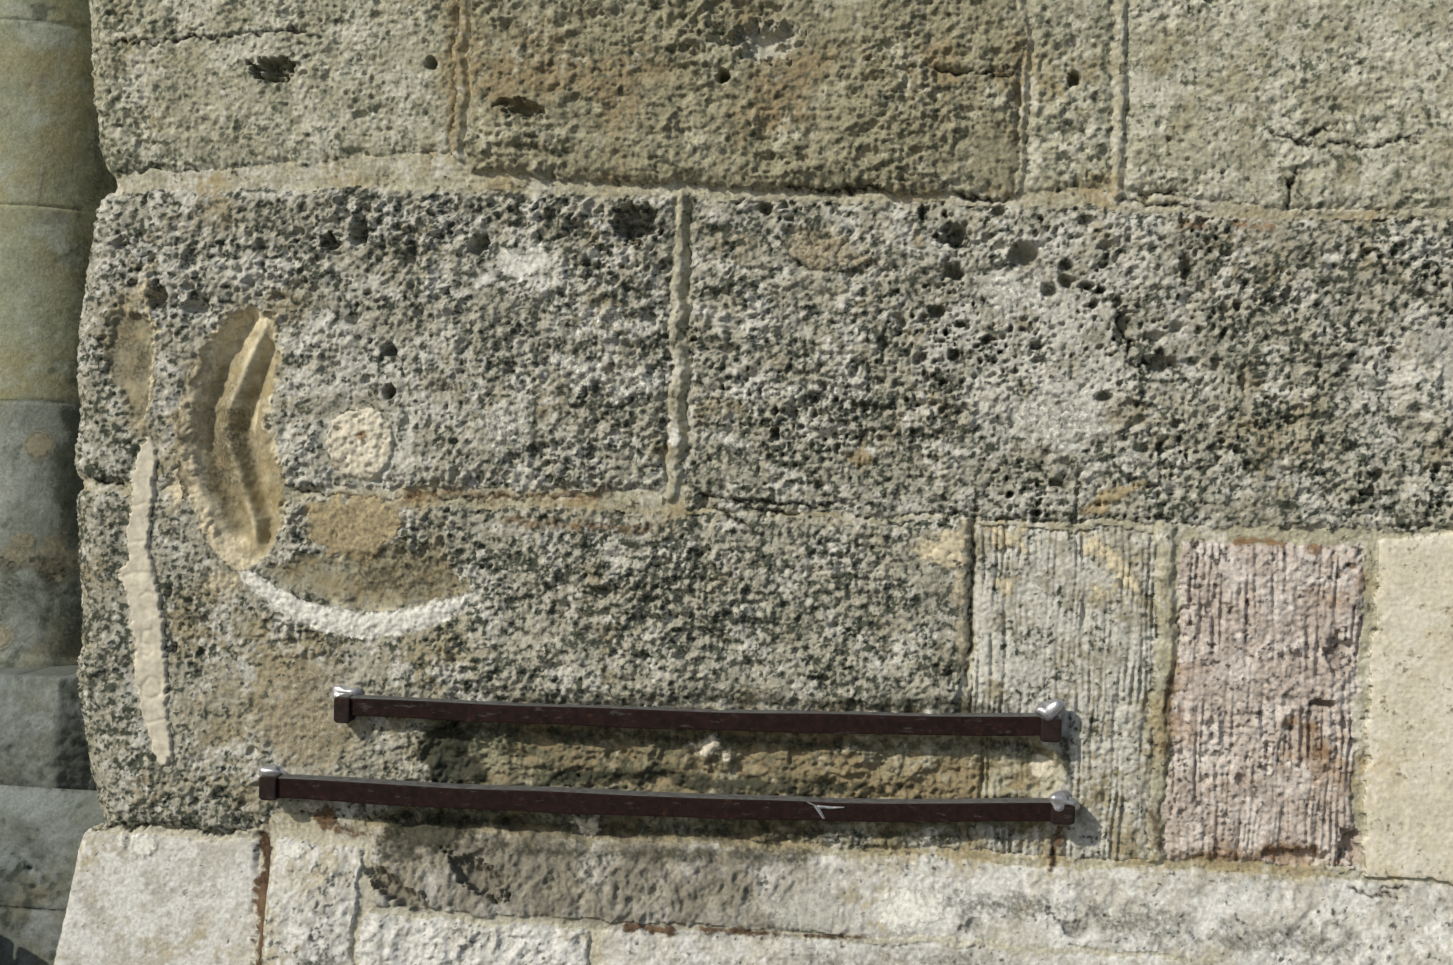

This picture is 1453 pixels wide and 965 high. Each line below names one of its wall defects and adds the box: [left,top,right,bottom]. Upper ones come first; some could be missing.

crack [94,24,321,54]
crack [1270,123,1418,210]
rust [1047,826,1064,872]
rust [250,826,272,965]